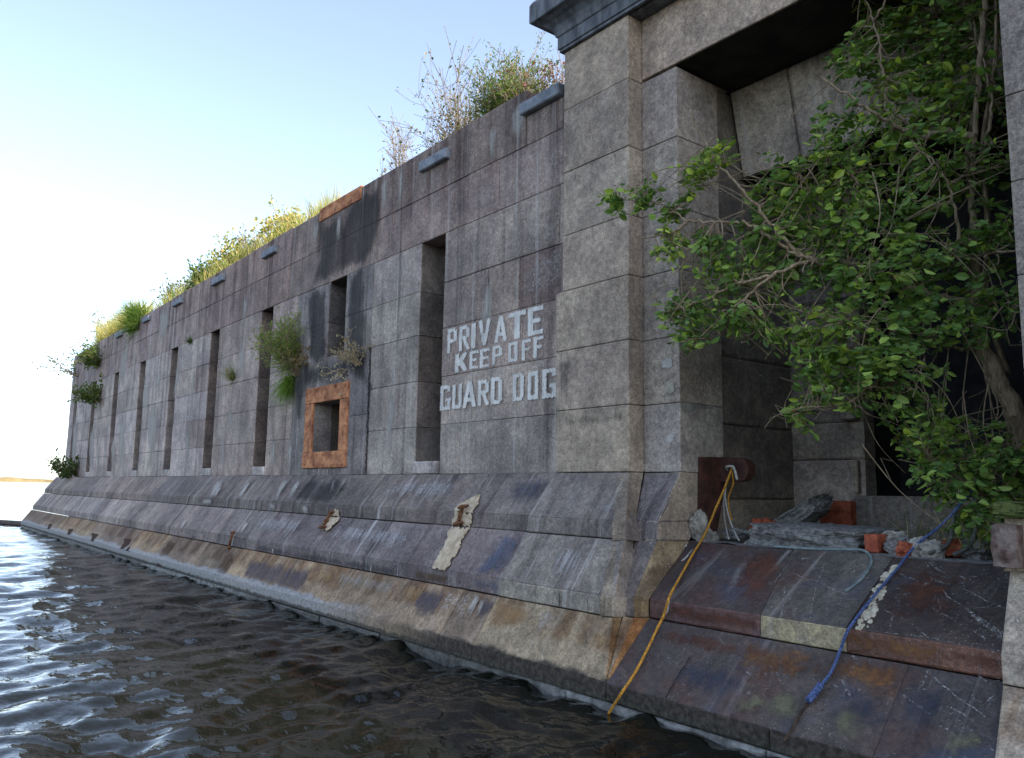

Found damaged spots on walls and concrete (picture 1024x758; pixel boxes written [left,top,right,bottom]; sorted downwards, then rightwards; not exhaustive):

water stain [297,272,364,417]
spalling [322,509,340,531]
spalling [432,494,480,571]